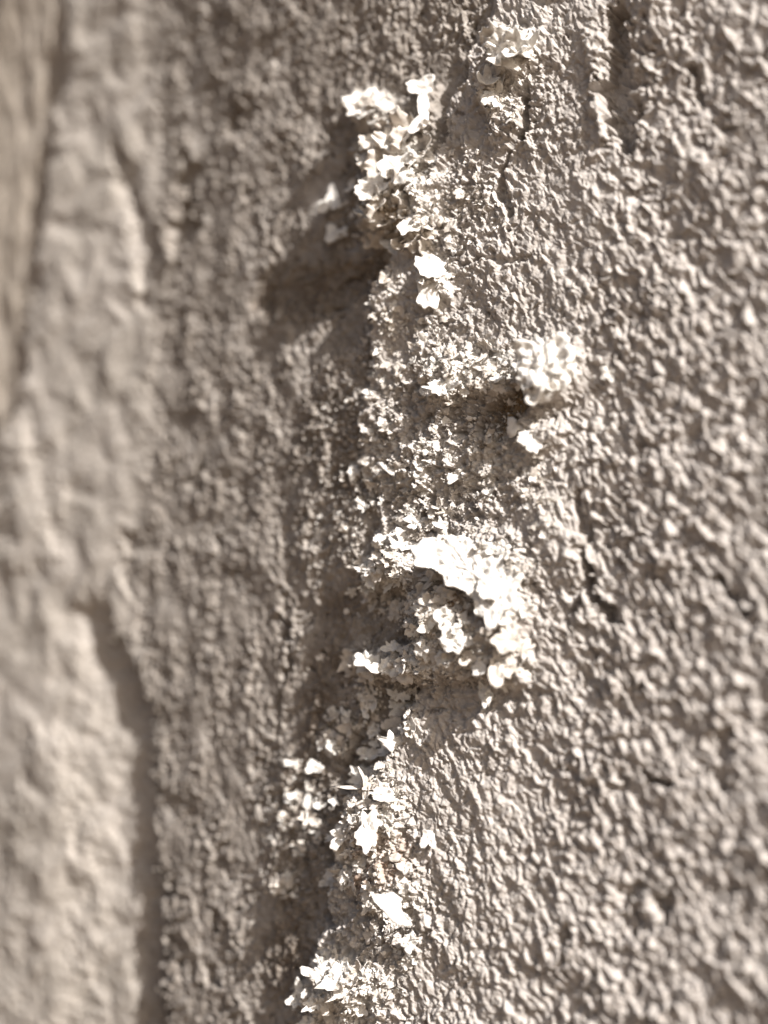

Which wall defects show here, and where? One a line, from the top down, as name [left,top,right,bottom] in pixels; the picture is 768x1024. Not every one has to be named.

flaking render [237,20,587,1024]